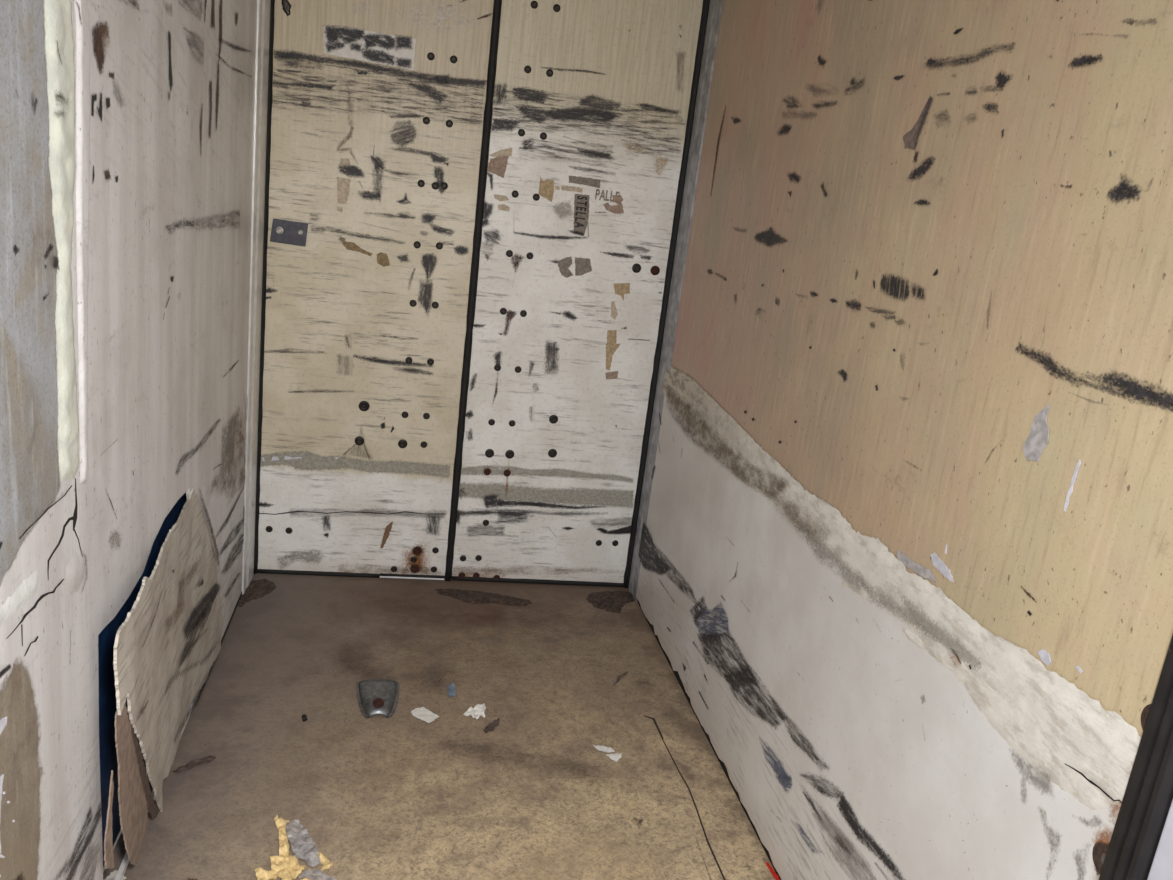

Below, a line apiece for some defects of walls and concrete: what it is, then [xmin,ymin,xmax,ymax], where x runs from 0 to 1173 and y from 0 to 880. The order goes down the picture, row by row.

peeling [1023,404,1050,461]
crack [6,478,83,656]
corrosion [380,521,393,548]
damp [659,387,981,669]
peeling [897,543,954,583]
peeling [0,663,42,880]
damp [1012,752,1051,801]
corrosion [1096,831,1112,854]